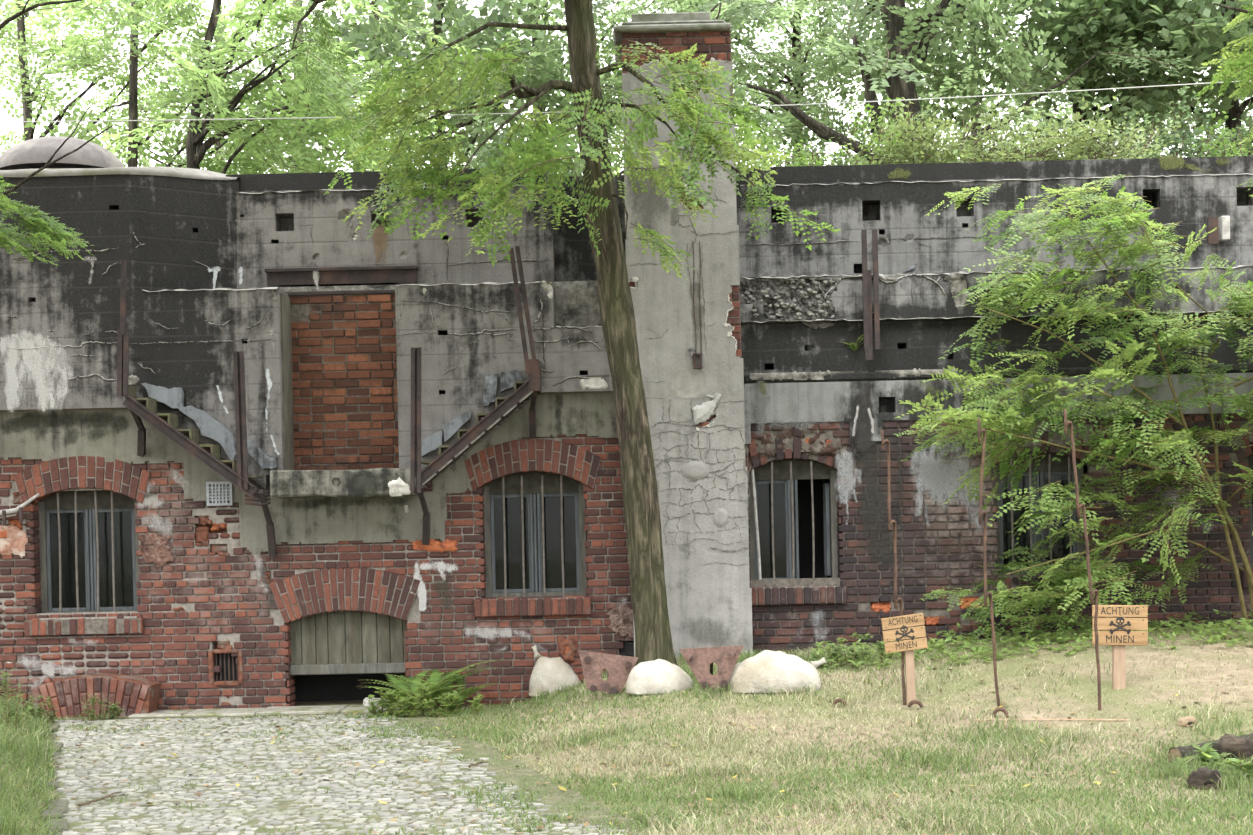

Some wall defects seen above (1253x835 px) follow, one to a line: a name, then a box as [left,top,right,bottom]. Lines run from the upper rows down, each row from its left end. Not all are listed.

flaking render [622,31,738,114]
crack [12,232,145,276]
crack [4,308,273,382]
spalling [724,278,842,358]
water stain [0,330,128,443]
crack [647,381,751,566]
spalling [0,520,28,558]
spalling [139,532,174,568]